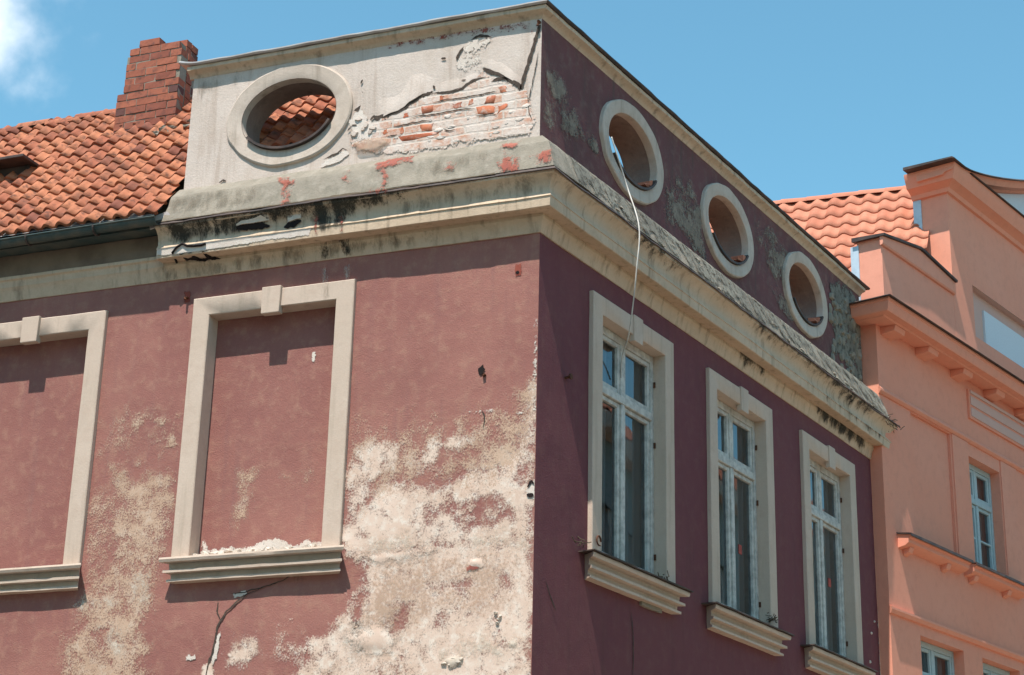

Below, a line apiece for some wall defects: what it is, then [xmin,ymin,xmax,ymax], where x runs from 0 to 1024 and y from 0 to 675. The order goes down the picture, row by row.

crack [370,25,541,120]
flaking render [319,37,599,168]
flaking render [157,214,311,262]
water stain [159,156,414,278]
water stain [565,152,886,448]
peeling [98,406,180,457]
peeling [57,459,176,675]
crack [201,577,288,675]
flaking render [201,538,321,553]
peeling [274,341,537,675]